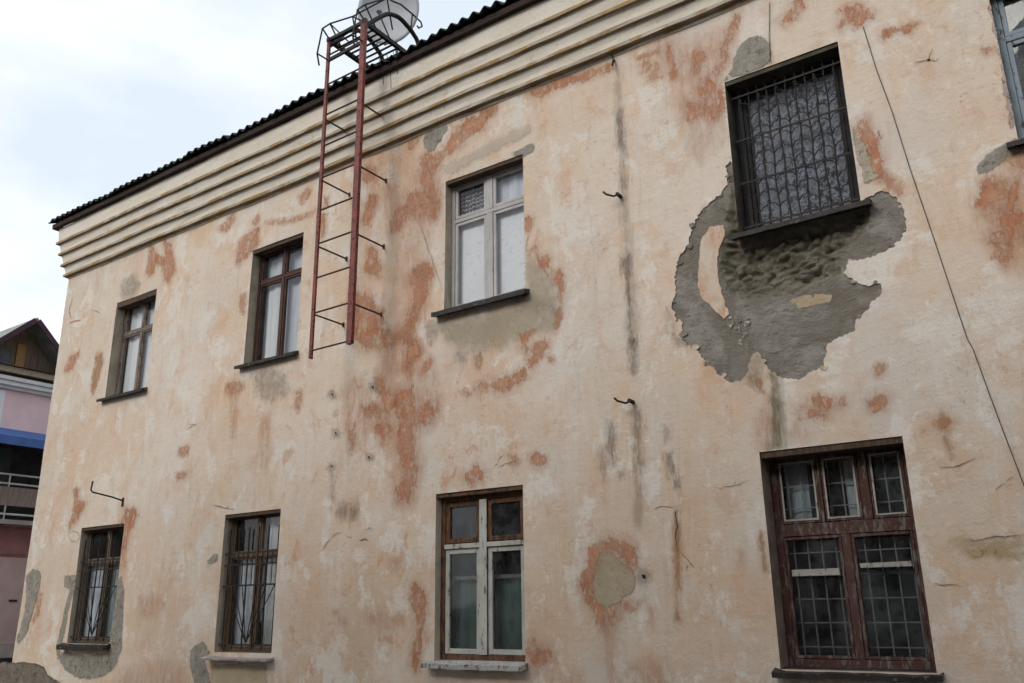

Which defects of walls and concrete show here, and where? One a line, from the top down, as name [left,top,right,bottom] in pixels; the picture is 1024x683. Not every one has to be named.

peeling [390,104,498,234]
peeling [530,63,615,97]
peeling [637,13,741,121]
peeling [975,0,1024,263]
spalling [671,120,907,383]
peeling [354,263,437,503]
spalling [16,570,43,644]
peeling [580,538,639,627]